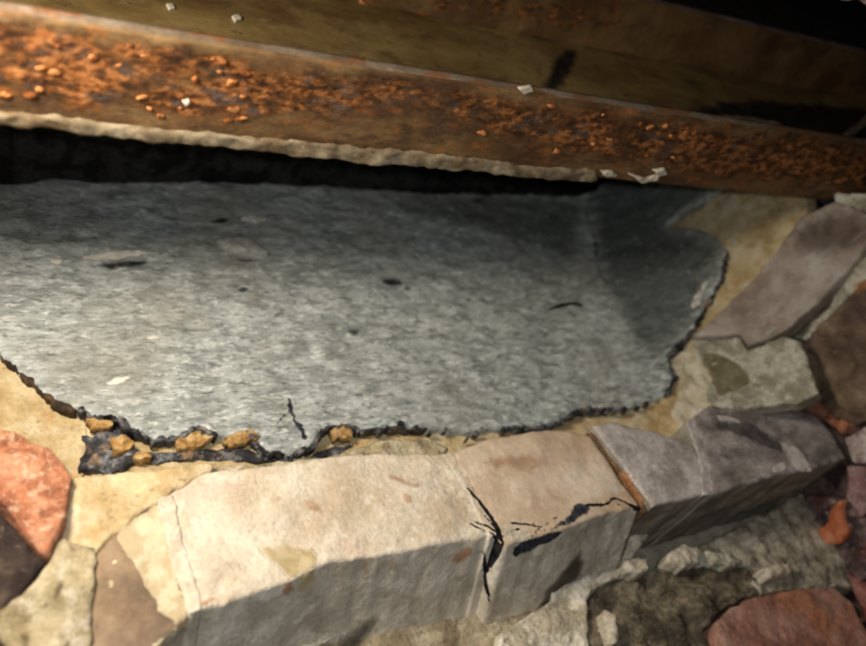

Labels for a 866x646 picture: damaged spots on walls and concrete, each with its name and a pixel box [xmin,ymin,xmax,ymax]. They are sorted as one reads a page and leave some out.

corrosion [0,22,436,123]
corrosion [449,89,866,190]
crack [277,395,307,439]
crack [467,487,520,602]
crack [586,497,642,512]